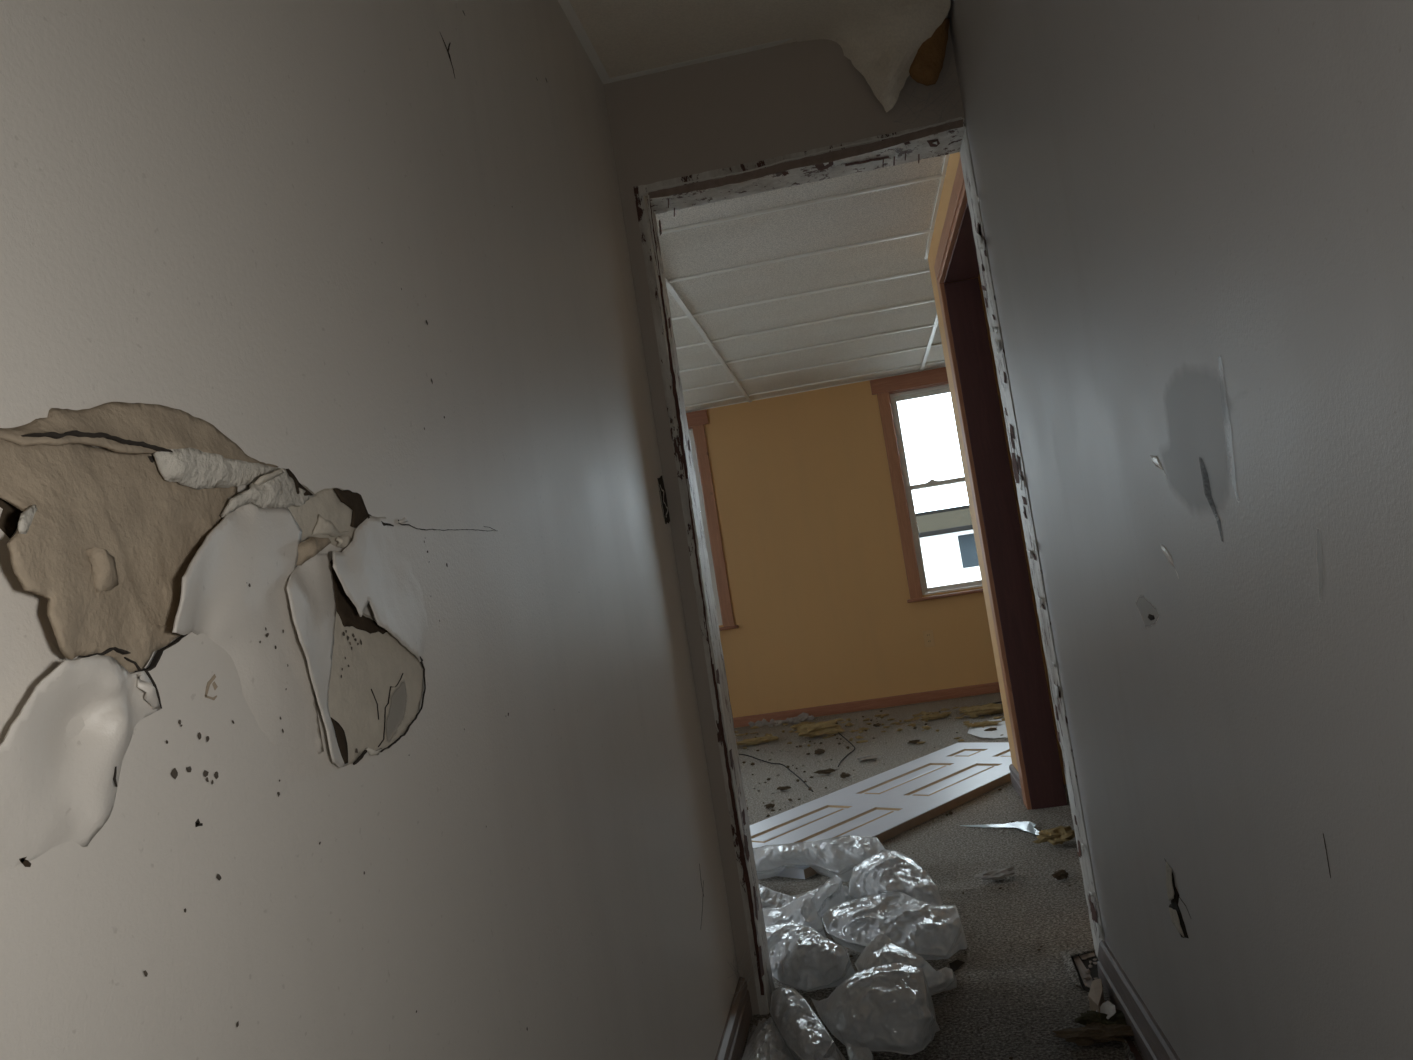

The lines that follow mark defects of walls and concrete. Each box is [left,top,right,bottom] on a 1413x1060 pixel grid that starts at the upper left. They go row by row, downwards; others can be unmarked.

peeling [286,514,429,768]
peeling [648,117,963,995]